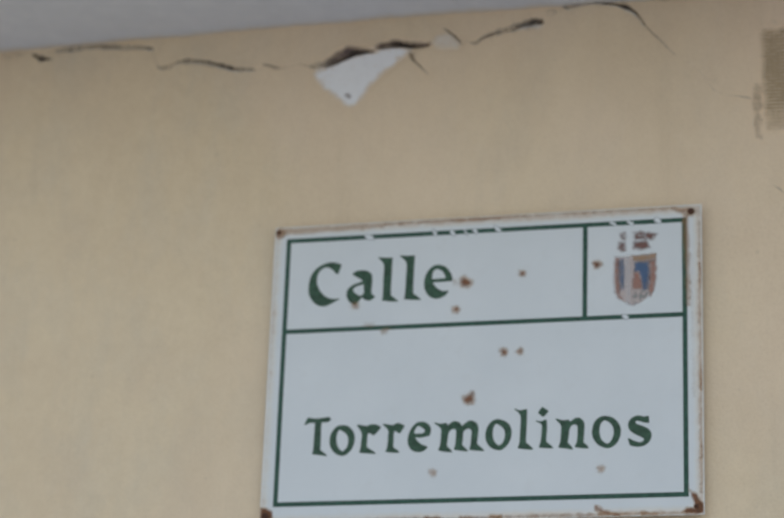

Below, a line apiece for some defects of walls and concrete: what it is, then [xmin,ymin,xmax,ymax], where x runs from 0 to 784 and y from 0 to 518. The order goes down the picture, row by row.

crack [498,18,544,34]
crack [560,3,661,41]
crack [33,45,277,73]
spalling [310,41,429,110]